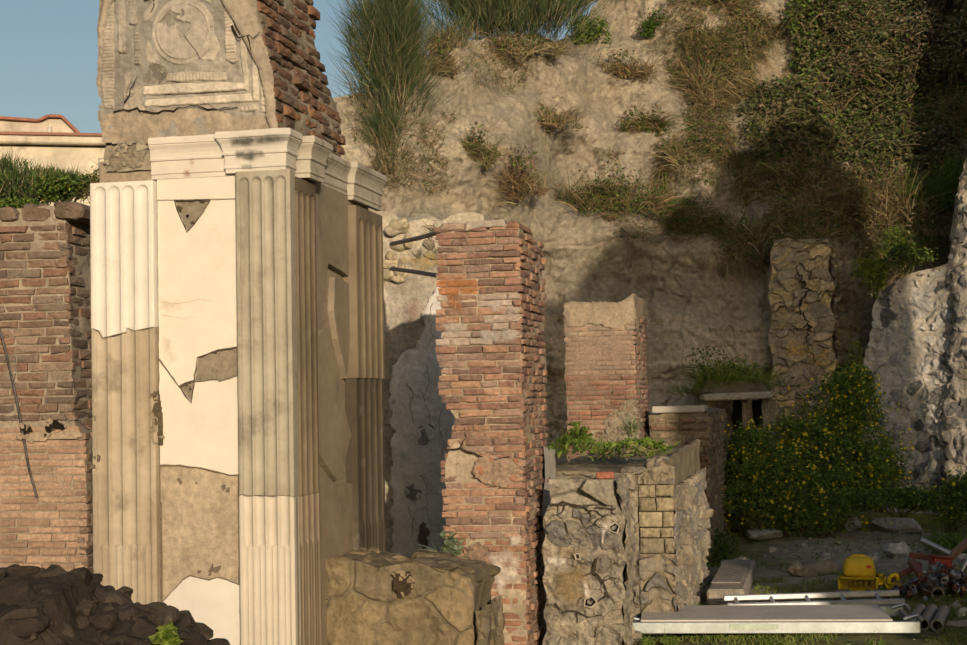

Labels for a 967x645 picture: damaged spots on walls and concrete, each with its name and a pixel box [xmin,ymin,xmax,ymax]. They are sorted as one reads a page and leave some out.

peeling [174,199,211,232]
peeling [180,346,238,404]
spalling [90,417,101,473]
spalling [151,391,165,445]
crack [406,303,510,550]
peeling [159,464,240,602]